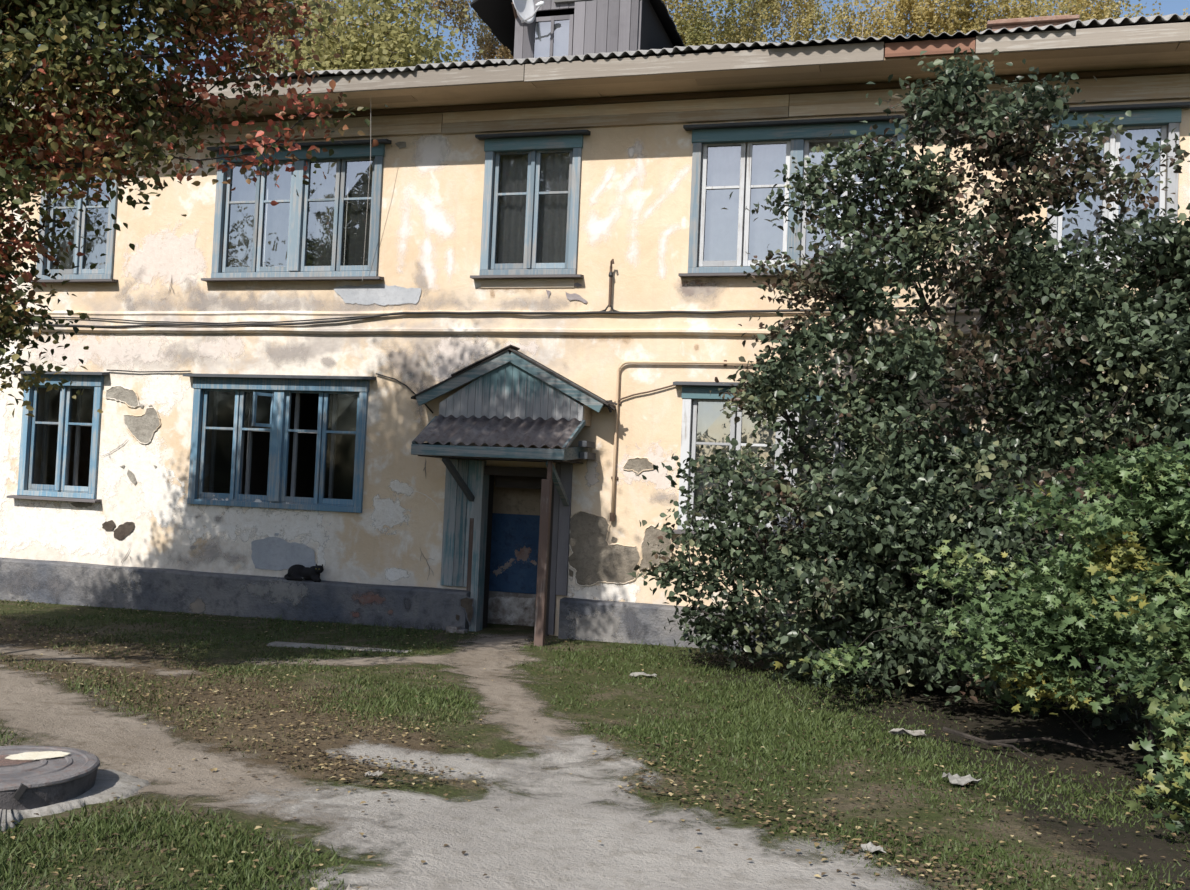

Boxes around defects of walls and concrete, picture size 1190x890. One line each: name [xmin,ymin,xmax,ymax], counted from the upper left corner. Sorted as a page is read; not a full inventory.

peeling [391,136,448,172]
peeling [586,143,644,242]
peeling [399,197,454,288]
peeling [0,332,330,567]
peeling [493,546,536,577]
flaking render [567,510,678,642]